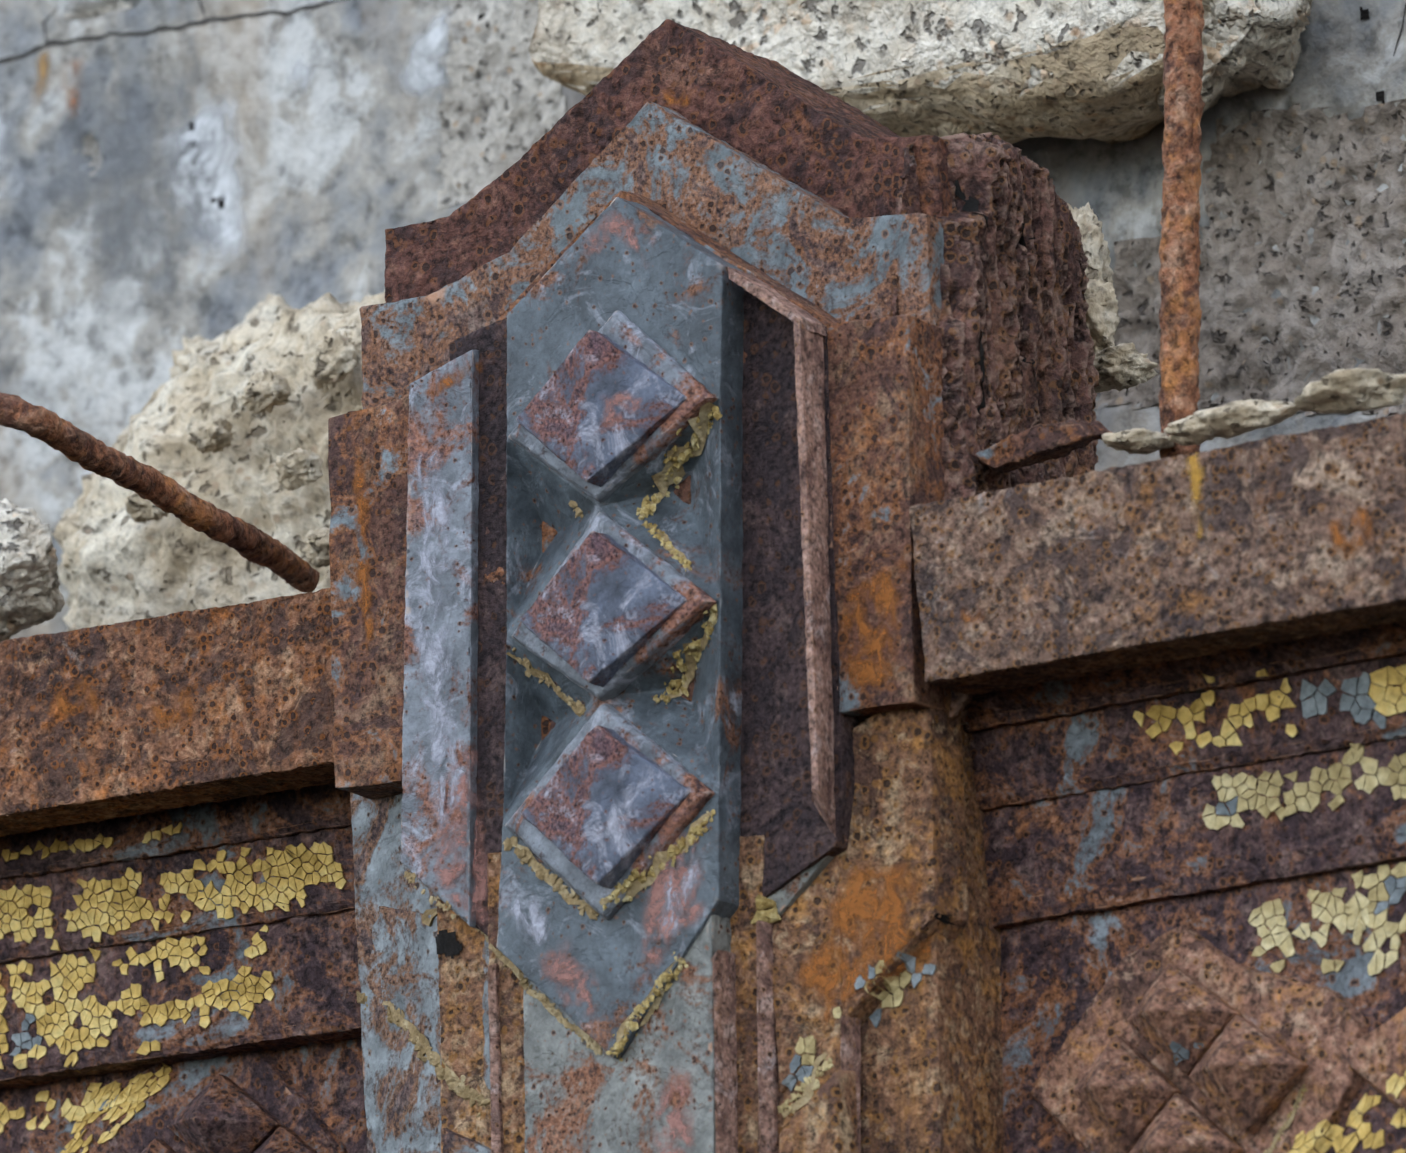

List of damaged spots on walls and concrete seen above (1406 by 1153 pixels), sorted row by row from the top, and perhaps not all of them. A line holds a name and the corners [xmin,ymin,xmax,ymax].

crack [0,0,340,63]
spalling [1197,99,1406,419]
corrosion [1189,452,1201,499]
corrosion [844,573,895,685]
peeling [1133,664,1406,755]
corrosion [438,752,487,922]
peeling [1202,743,1406,830]
peeling [0,842,347,1153]
corrosion [646,838,700,961]
corrosion [801,869,931,1018]
peeling [1248,862,1406,976]
peeling [1263,1072,1406,1153]